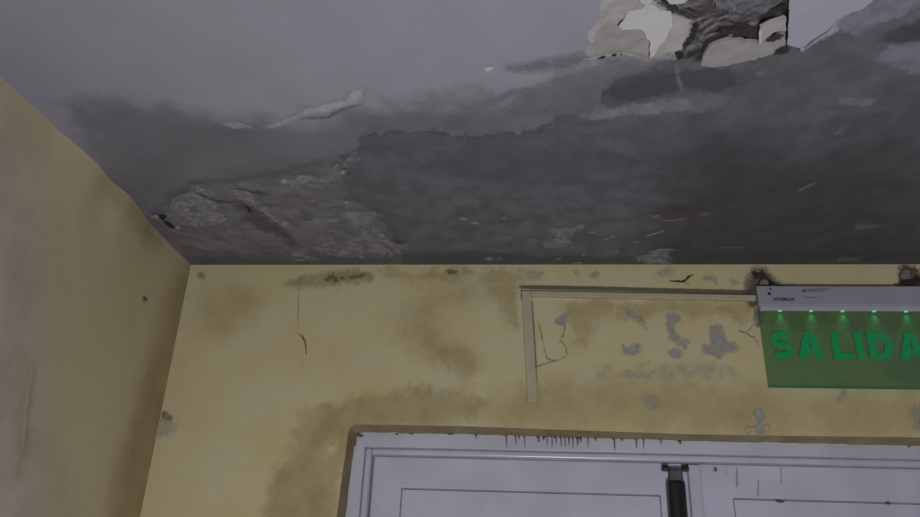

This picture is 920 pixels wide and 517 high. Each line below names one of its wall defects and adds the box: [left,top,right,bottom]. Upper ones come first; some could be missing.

spalling [583,0,920,68]
peeling [268,89,365,128]
damp [109,7,920,274]
damp [325,258,372,284]